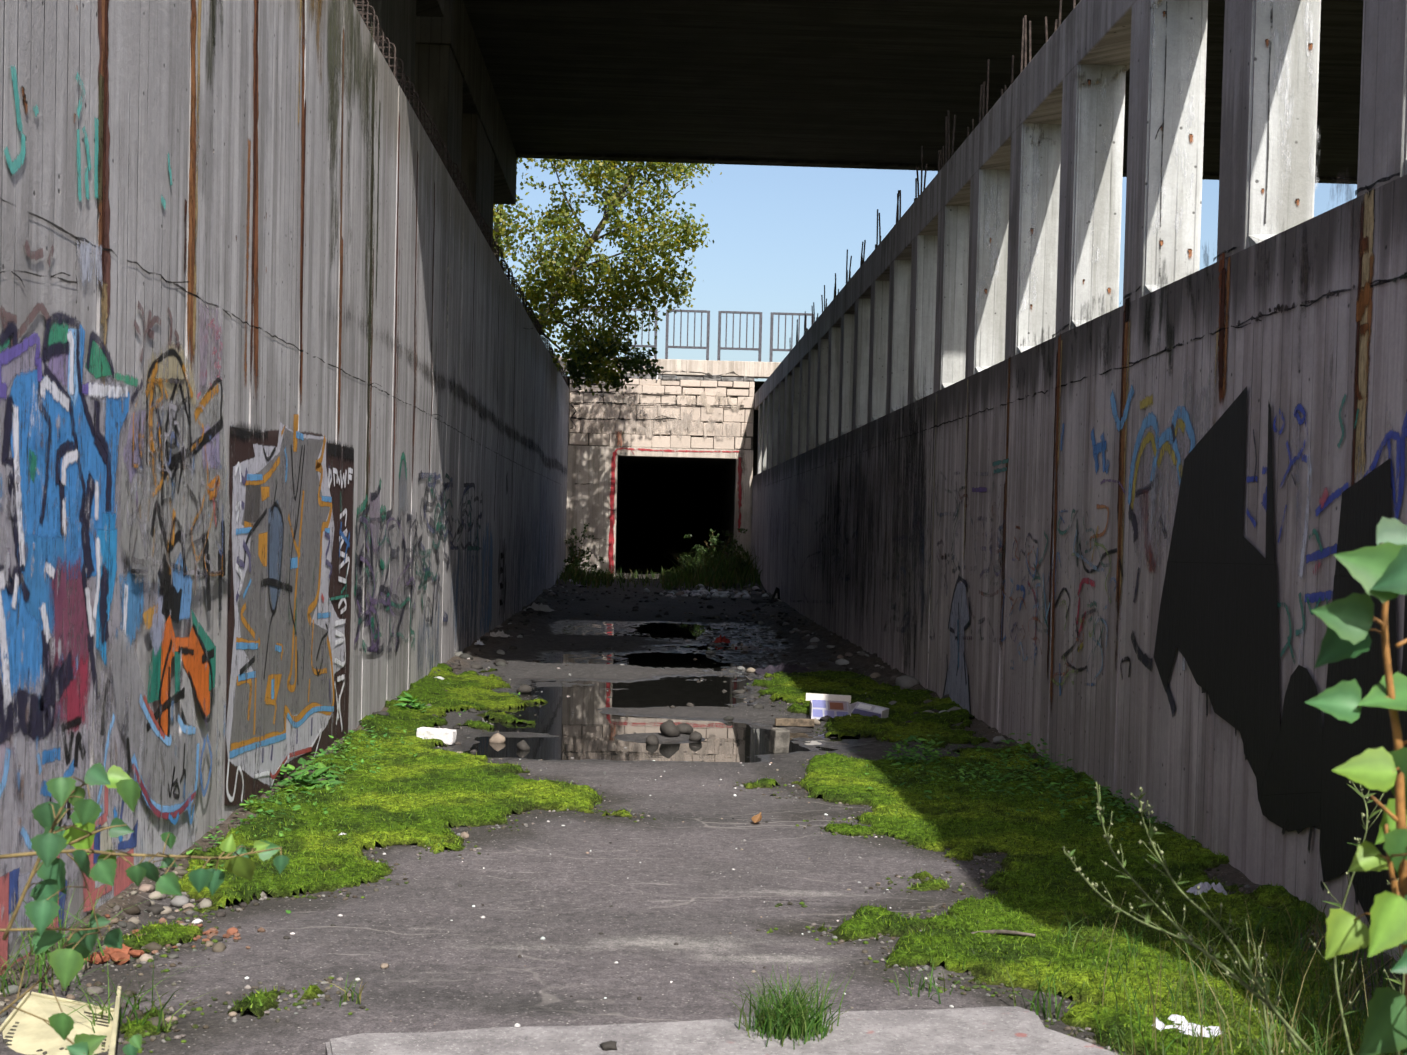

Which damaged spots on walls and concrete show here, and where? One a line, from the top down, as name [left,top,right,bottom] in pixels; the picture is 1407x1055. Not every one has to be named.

corrosion [97,0,111,356]
corrosion [184,0,202,372]
corrosion [244,0,259,393]
crack [0,198,592,485]
leakage [797,375,937,677]
crack [768,276,1407,485]
corrosion [1115,298,1130,670]
corrosion [1214,252,1230,403]
corrosion [1351,189,1374,486]